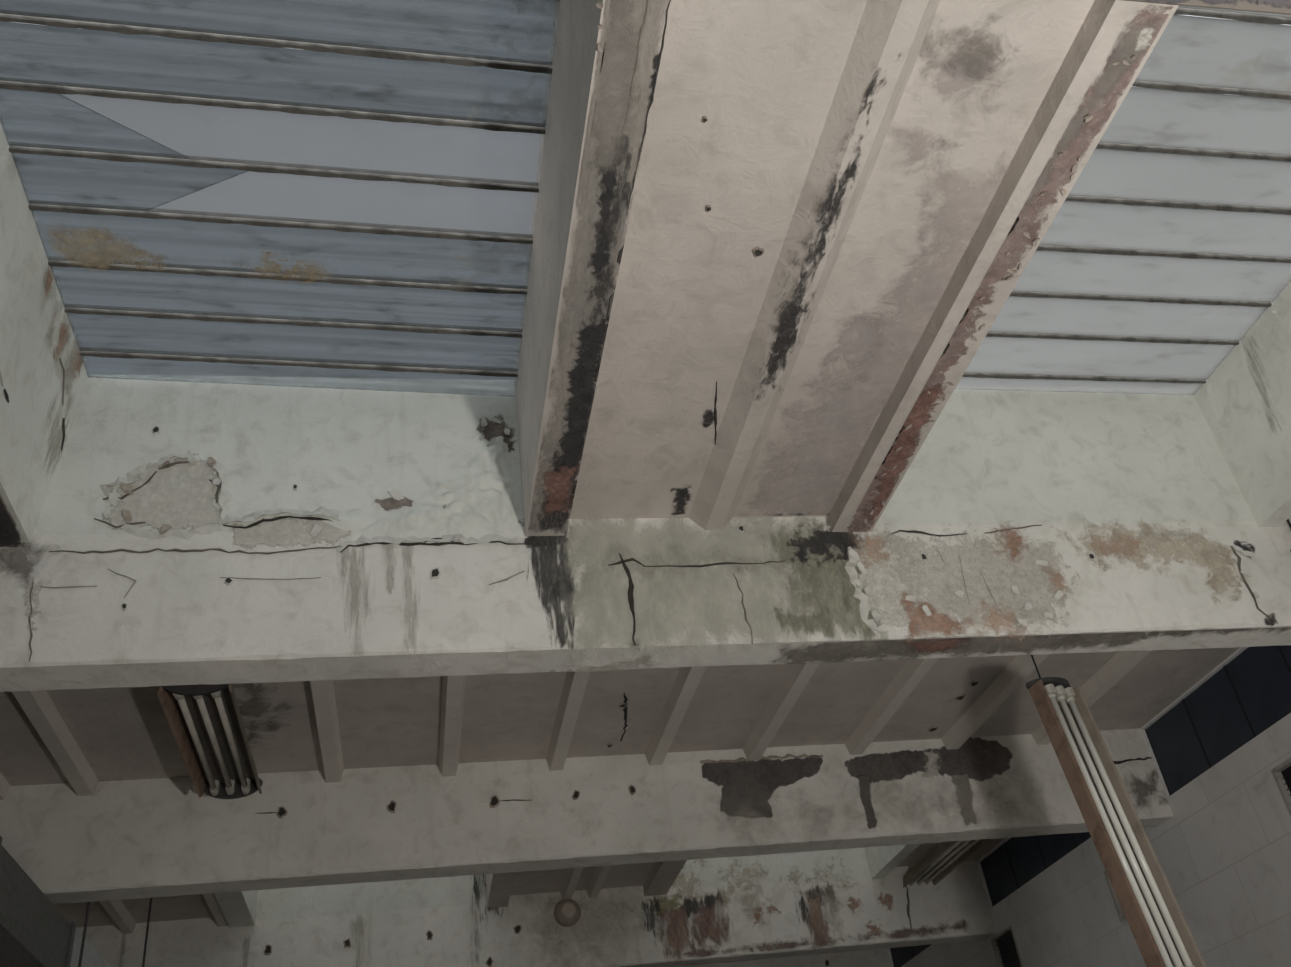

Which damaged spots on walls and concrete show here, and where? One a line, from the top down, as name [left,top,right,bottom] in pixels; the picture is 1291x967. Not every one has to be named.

damp [518,0,1291,664]
peeling [845,0,1291,640]
flaking render [94,450,351,548]
crack [608,553,785,651]
peeling [700,753,824,818]
peeling [845,737,1012,829]